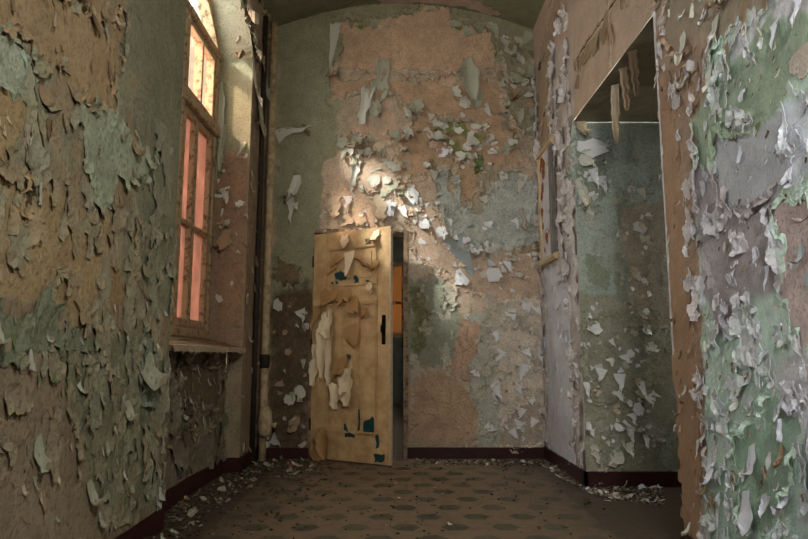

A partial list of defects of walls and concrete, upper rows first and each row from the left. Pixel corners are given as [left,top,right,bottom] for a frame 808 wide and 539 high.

crack [566,0,627,120]
flaking render [0,86,28,162]
peeling [235,0,353,461]
flaking render [319,0,808,539]
peeling [0,324,17,353]
peeling [28,349,37,371]
peeling [122,340,222,445]
spalling [0,433,165,539]